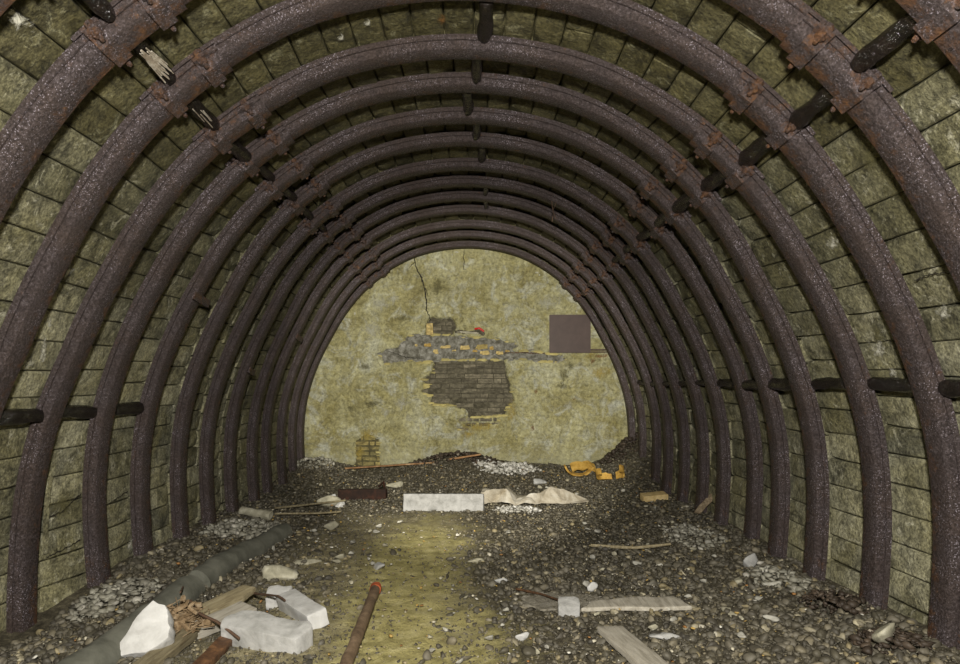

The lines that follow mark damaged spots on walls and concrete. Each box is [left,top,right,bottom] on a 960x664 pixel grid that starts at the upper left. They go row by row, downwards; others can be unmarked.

crack [411,258,431,320]
flaking render [377,318,567,431]
flaking render [354,434,382,466]